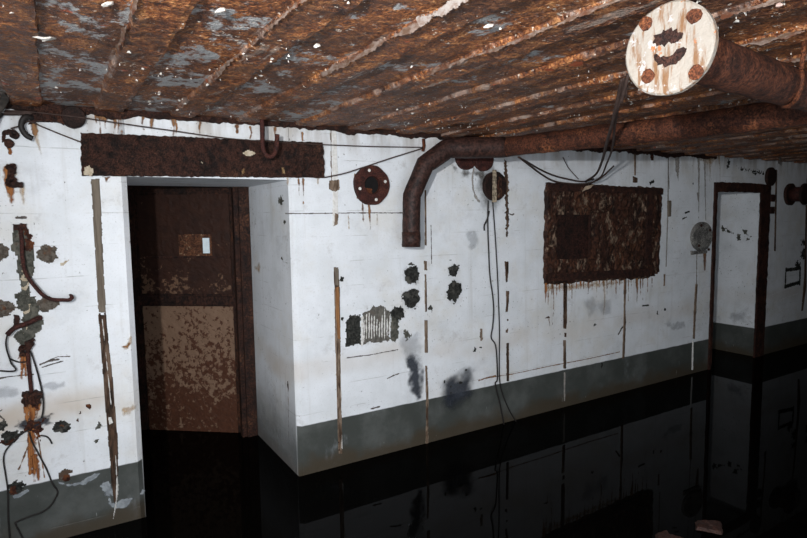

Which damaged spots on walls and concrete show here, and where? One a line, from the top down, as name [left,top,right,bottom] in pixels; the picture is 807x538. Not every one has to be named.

rust [5,101,479,141]
rust [572,147,717,160]
rust [3,166,24,203]
spalling [0,216,69,345]
peeling [446,260,462,304]
peeling [341,262,420,347]
spalling [0,404,91,446]